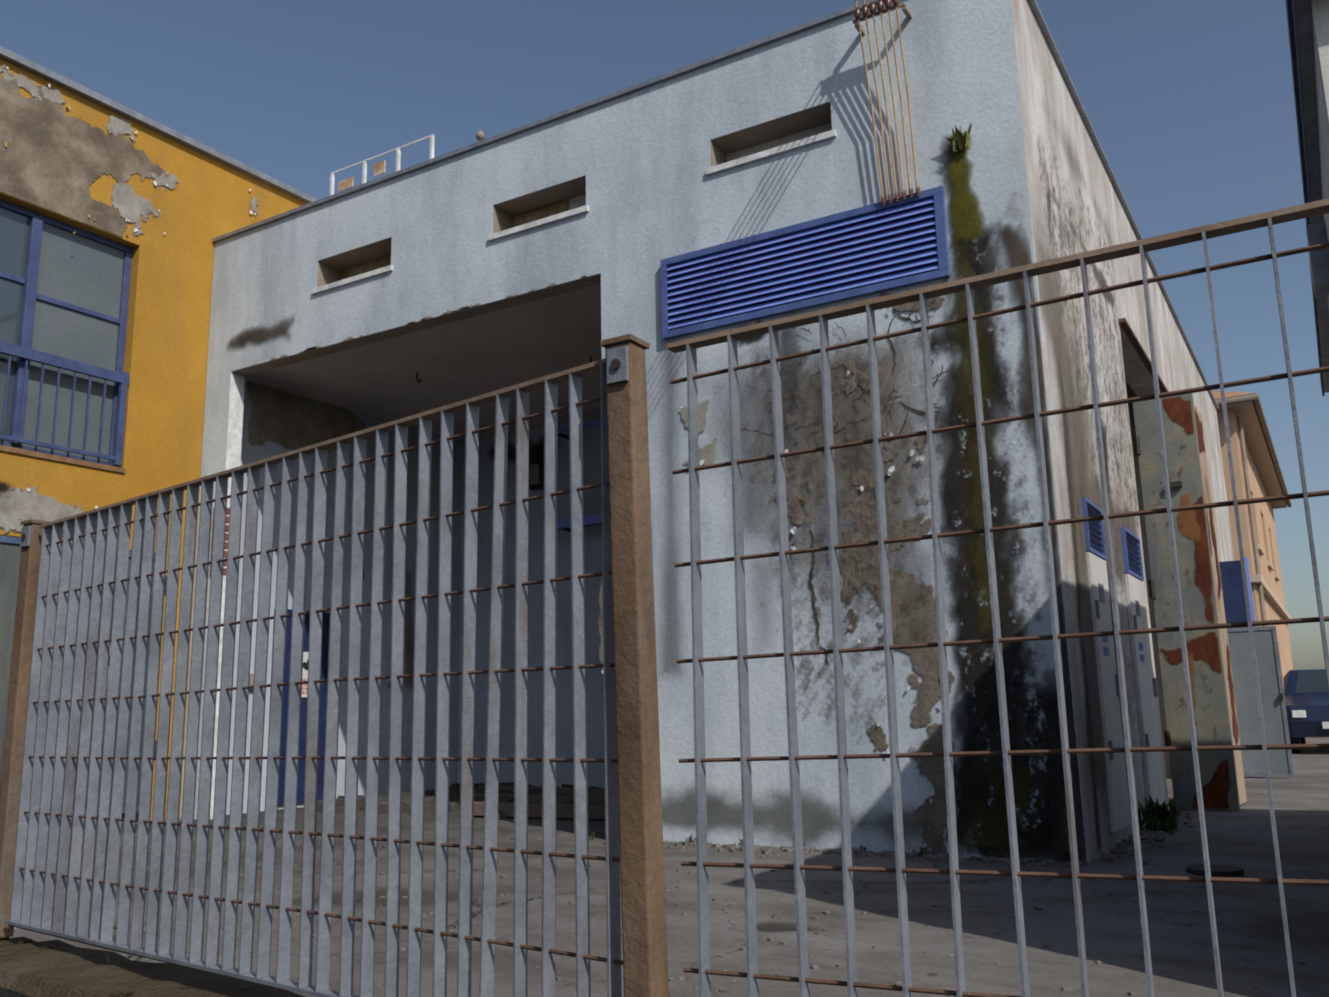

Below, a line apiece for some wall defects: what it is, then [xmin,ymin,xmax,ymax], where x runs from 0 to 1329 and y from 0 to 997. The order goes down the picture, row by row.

peeling [0,63,179,237]
water stain [945,138,953,195]
water stain [229,318,292,347]
peeling [880,292,945,312]
peeling [246,381,366,454]
water stain [756,328,919,513]
corrosion [1162,397,1205,453]
flaking render [0,486,98,533]
crack [808,530,828,664]
peeling [753,356,994,857]
water stain [930,225,1137,862]
corrosion [1154,494,1239,744]